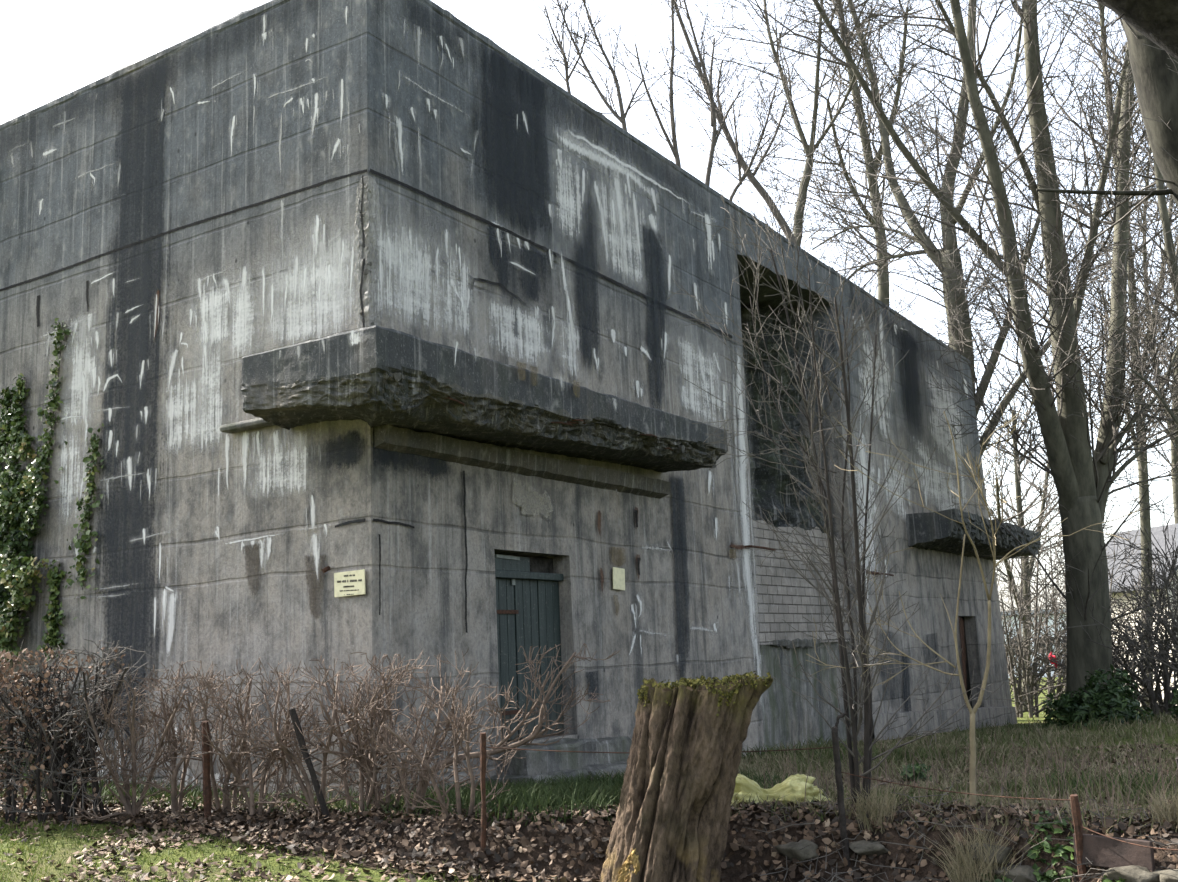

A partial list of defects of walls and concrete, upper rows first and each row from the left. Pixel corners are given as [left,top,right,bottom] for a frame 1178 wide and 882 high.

leakage [0,128,57,164]
leakage [385,70,462,172]
leakage [41,14,447,776]
spalling [272,370,373,411]
crack [0,168,733,339]
leakage [374,216,470,362]
leakage [404,6,761,679]
spalling [491,399,721,468]